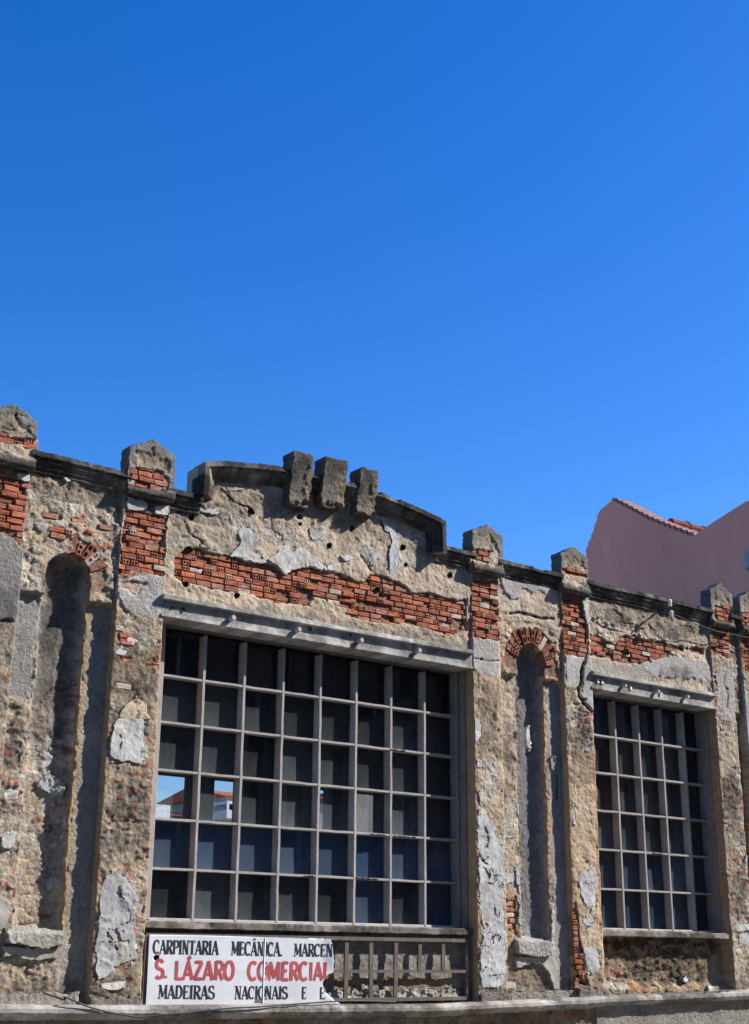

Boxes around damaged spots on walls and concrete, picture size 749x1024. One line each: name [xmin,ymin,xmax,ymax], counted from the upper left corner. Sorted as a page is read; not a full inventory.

flaking render [0,471,30,545]
flaking render [42,465,749,675]
peeling [476,788,560,991]
flaking render [571,865,602,987]